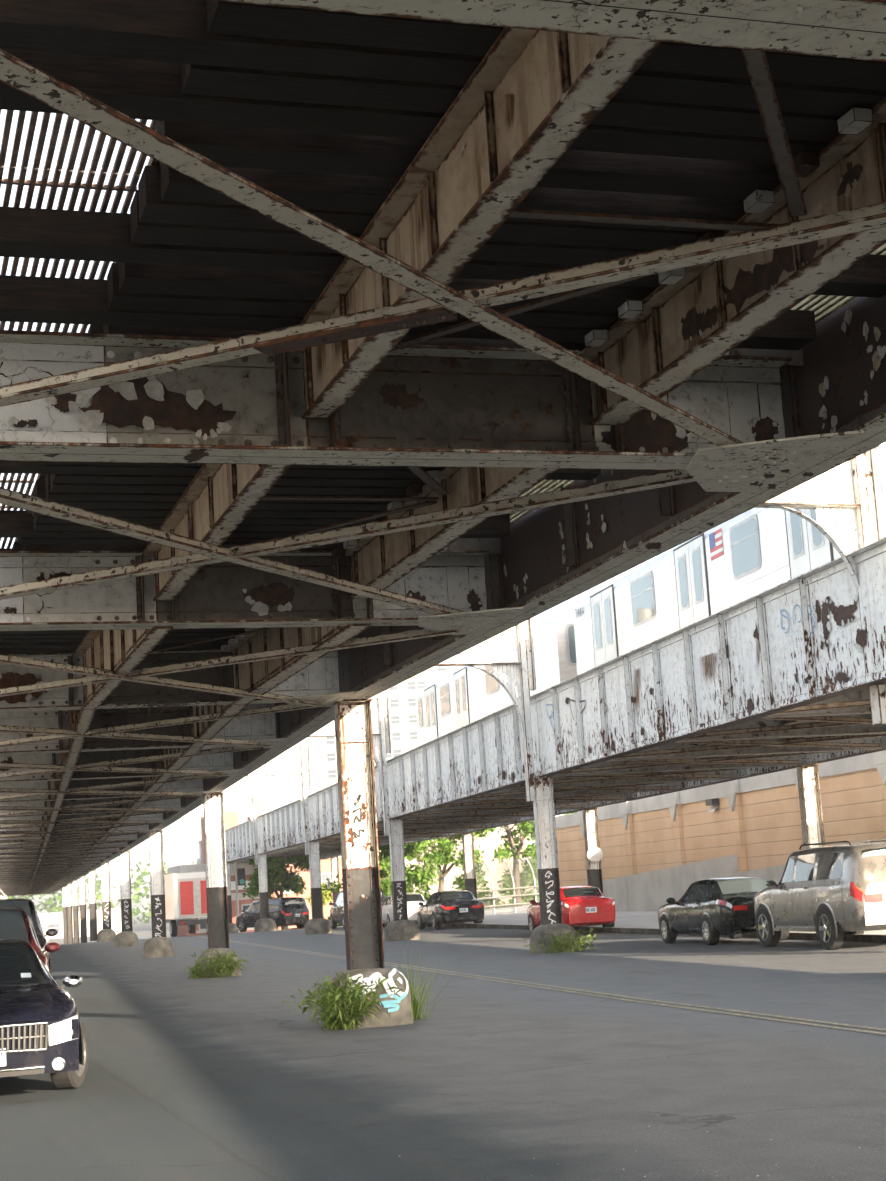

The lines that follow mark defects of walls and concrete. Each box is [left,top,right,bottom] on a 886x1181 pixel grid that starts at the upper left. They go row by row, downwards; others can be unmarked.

peeling [678,239,827,340]
peeling [841,309,886,406]
peeling [45,375,237,463]
peeling [601,409,694,464]
peeling [819,376,838,432]
peeling [243,582,296,616]
peeling [0,670,47,704]
rust [702,653,715,678]